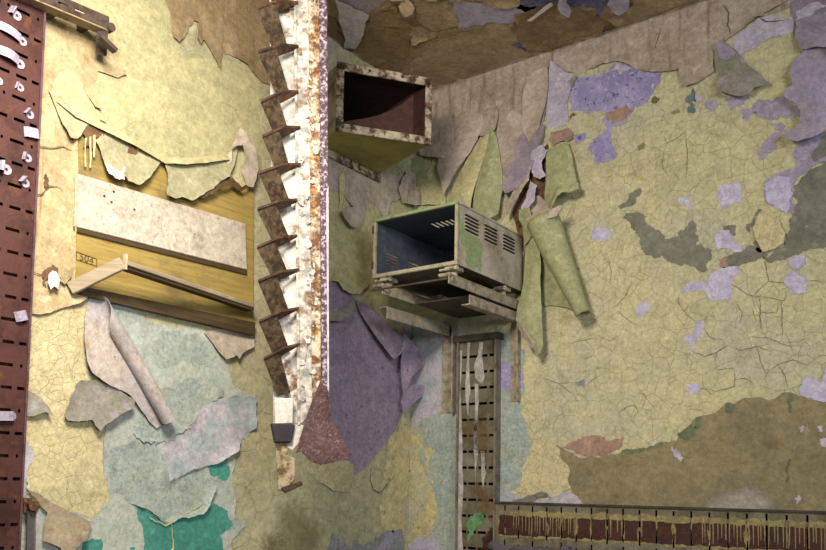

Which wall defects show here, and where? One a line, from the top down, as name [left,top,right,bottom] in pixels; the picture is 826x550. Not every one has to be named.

peeling [23,0,270,550]
peeling [305,0,826,550]
crack [678,264,826,396]